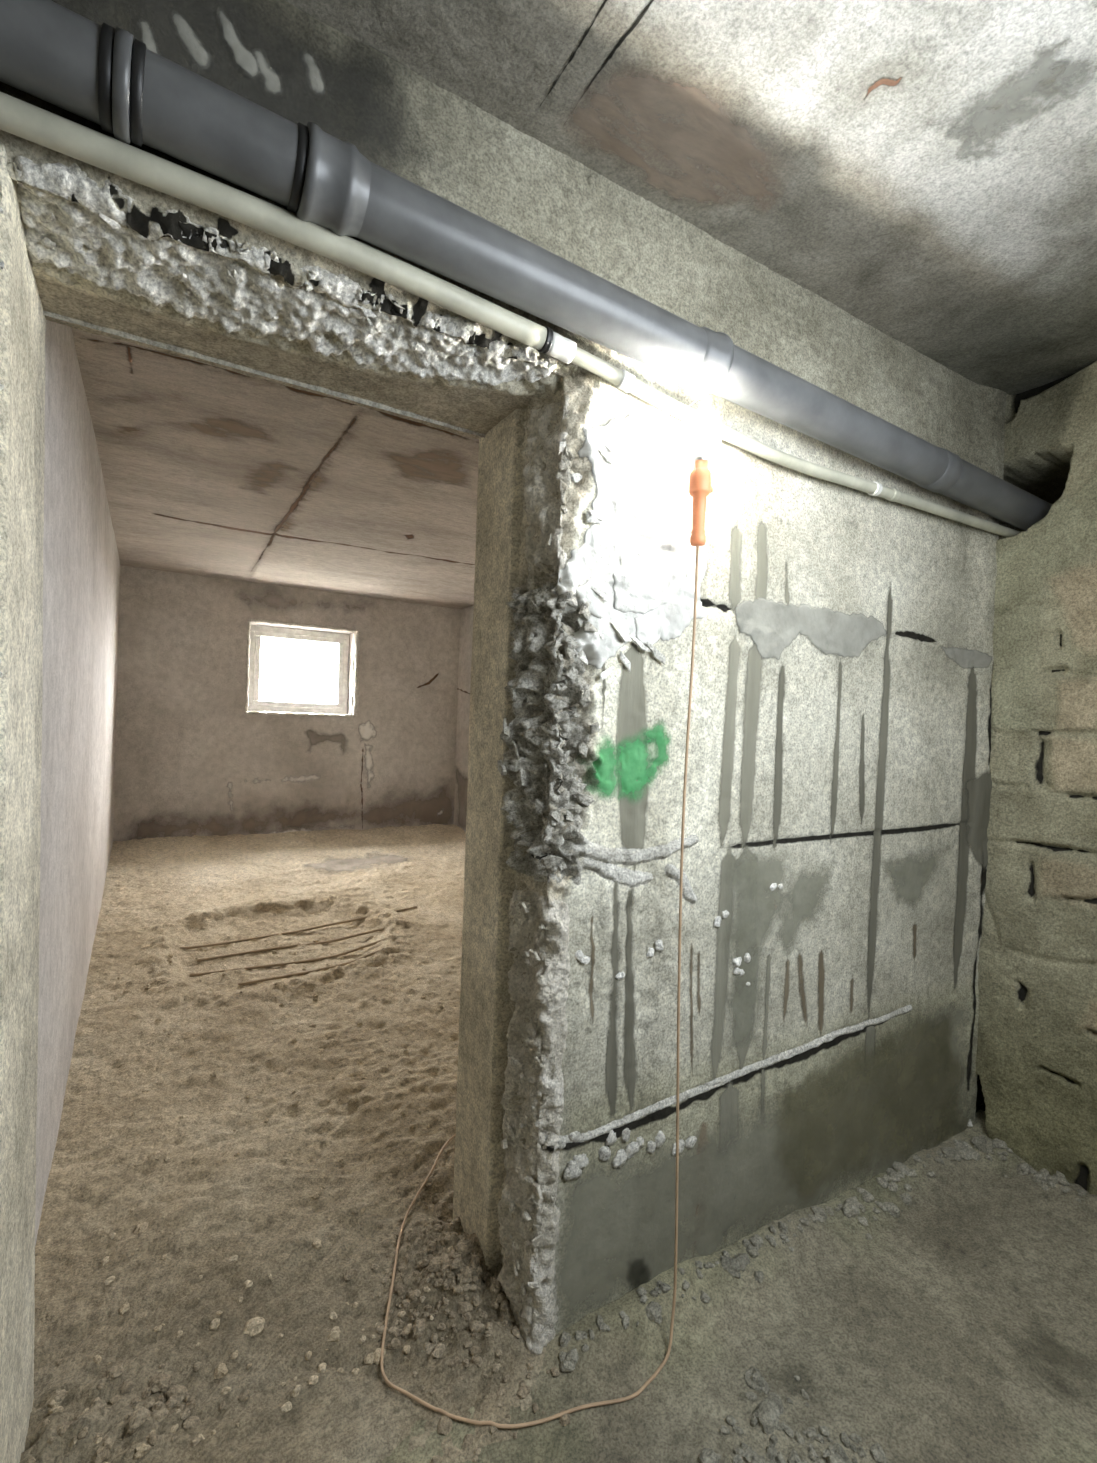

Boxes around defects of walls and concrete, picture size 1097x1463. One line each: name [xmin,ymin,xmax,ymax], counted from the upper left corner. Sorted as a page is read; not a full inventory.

crack [540,0,654,123]
rust [864,77,902,100]
water stain [947,41,1089,159]
spalling [0,155,563,386]
crack [83,338,479,565]
spalling [497,393,708,1355]
crack [541,1012,907,1152]
water stain [556,522,962,1315]
water stain [942,647,992,989]
crack [967,865,987,1091]
crack [987,663,995,764]